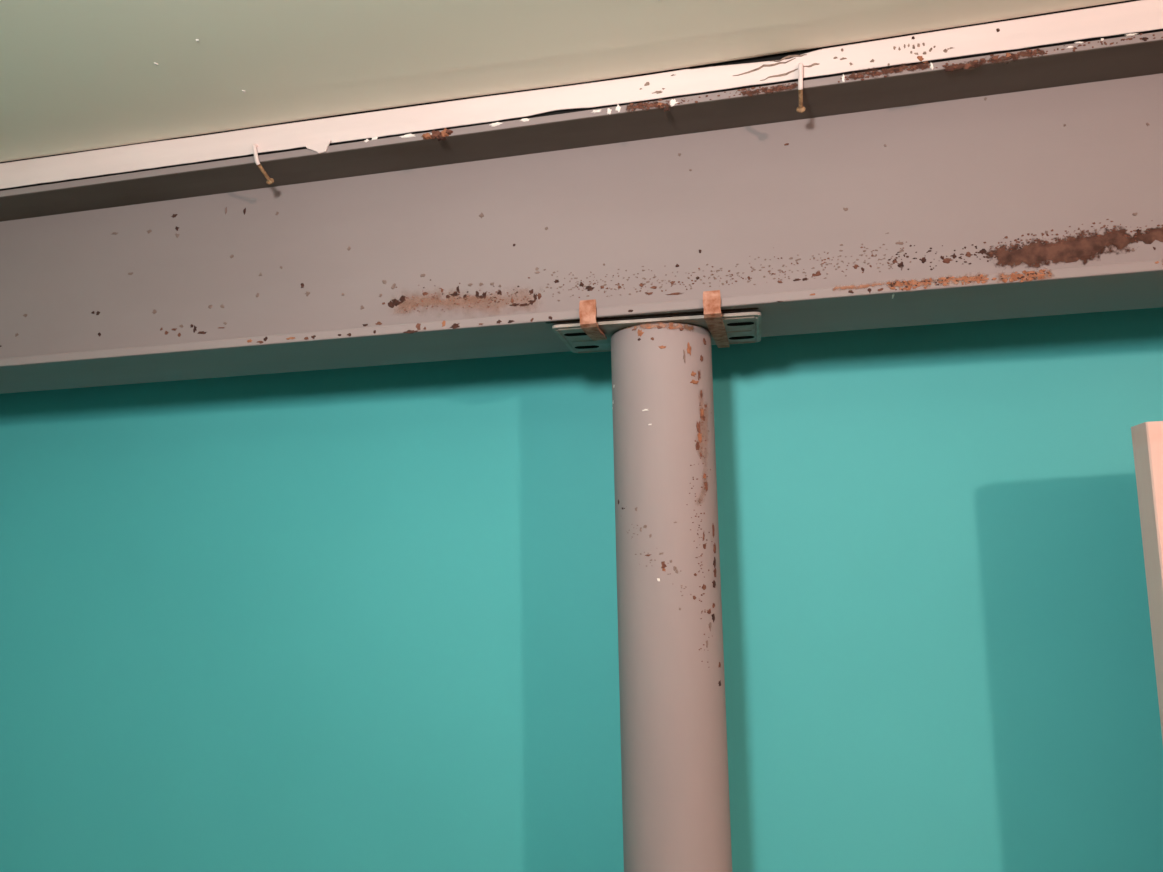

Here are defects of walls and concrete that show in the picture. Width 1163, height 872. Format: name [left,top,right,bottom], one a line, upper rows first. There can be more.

crack [690,47,821,81]
corrosion [160,322,227,337]
corrosion [379,212,1163,333]
corrosion [596,310,721,668]